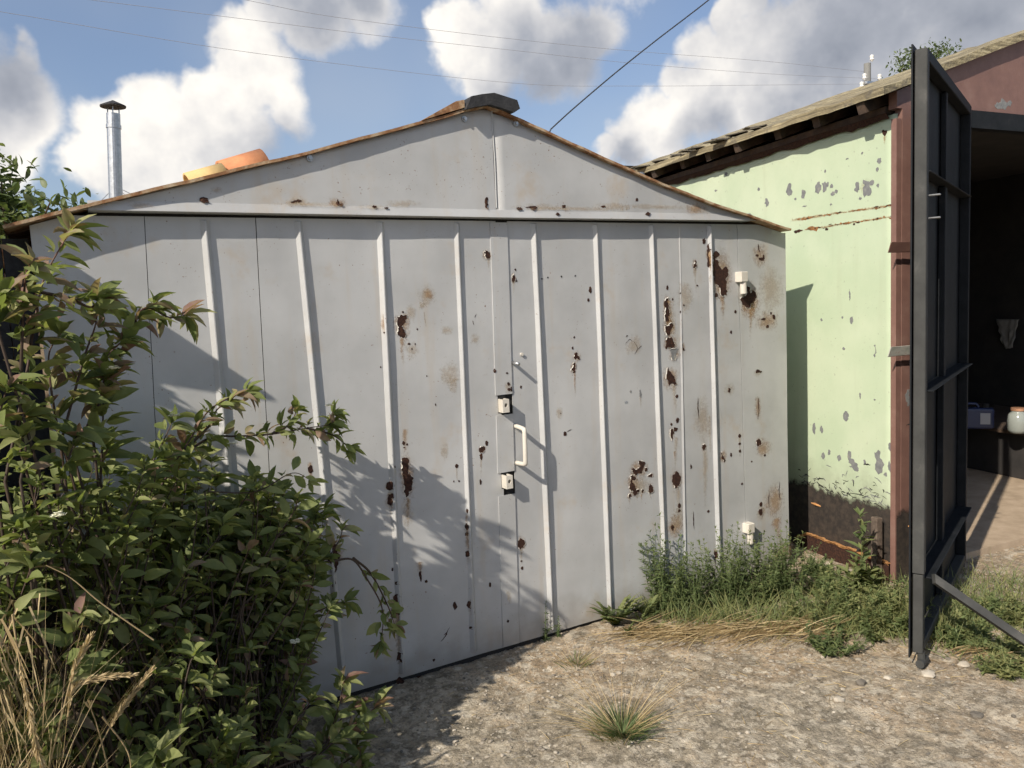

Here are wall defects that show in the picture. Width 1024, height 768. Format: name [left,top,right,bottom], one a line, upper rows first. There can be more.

peeling [786,170,838,207]
rust [794,204,891,233]
rust [734,286,775,328]
rust [383,311,418,350]
rust [665,368,678,398]
rust [386,431,414,506]
rust [628,460,654,498]
peeling [821,443,890,477]
rust [796,532,891,582]